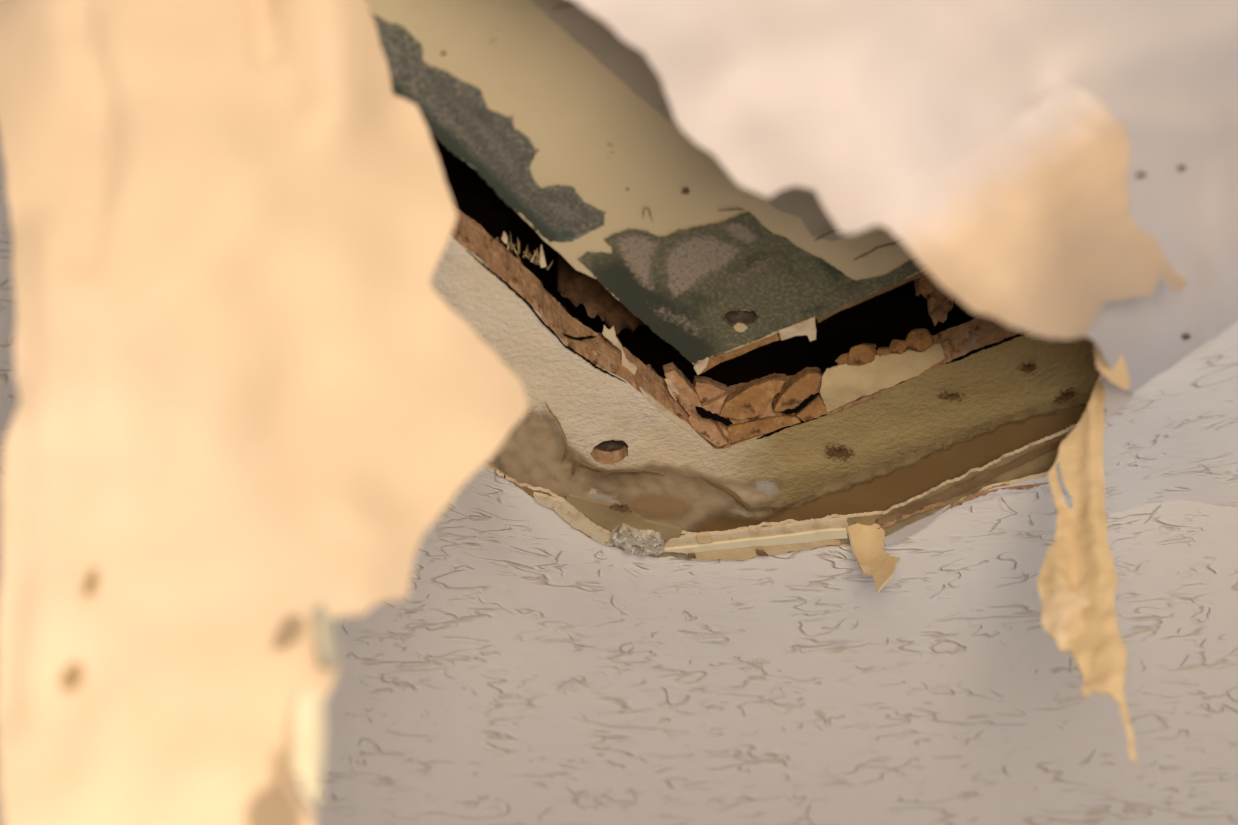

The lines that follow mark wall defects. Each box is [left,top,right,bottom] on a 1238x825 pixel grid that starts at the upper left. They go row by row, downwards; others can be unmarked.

peeling [371,0,1238,448]
peeling [687,375,1137,763]